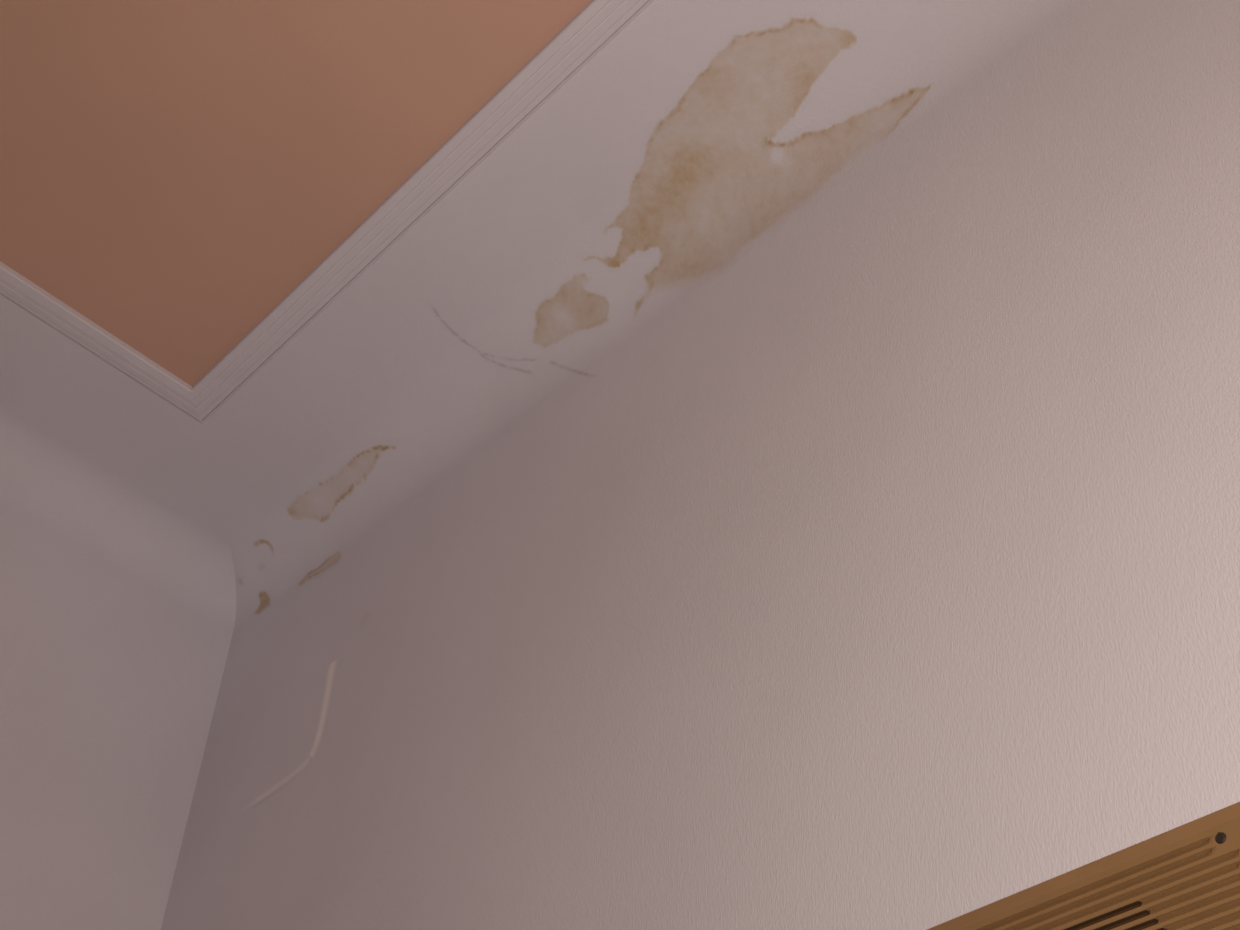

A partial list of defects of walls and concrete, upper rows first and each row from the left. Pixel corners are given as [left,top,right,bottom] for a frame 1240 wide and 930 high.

damp [529,14,934,351]
damp [284,441,399,525]